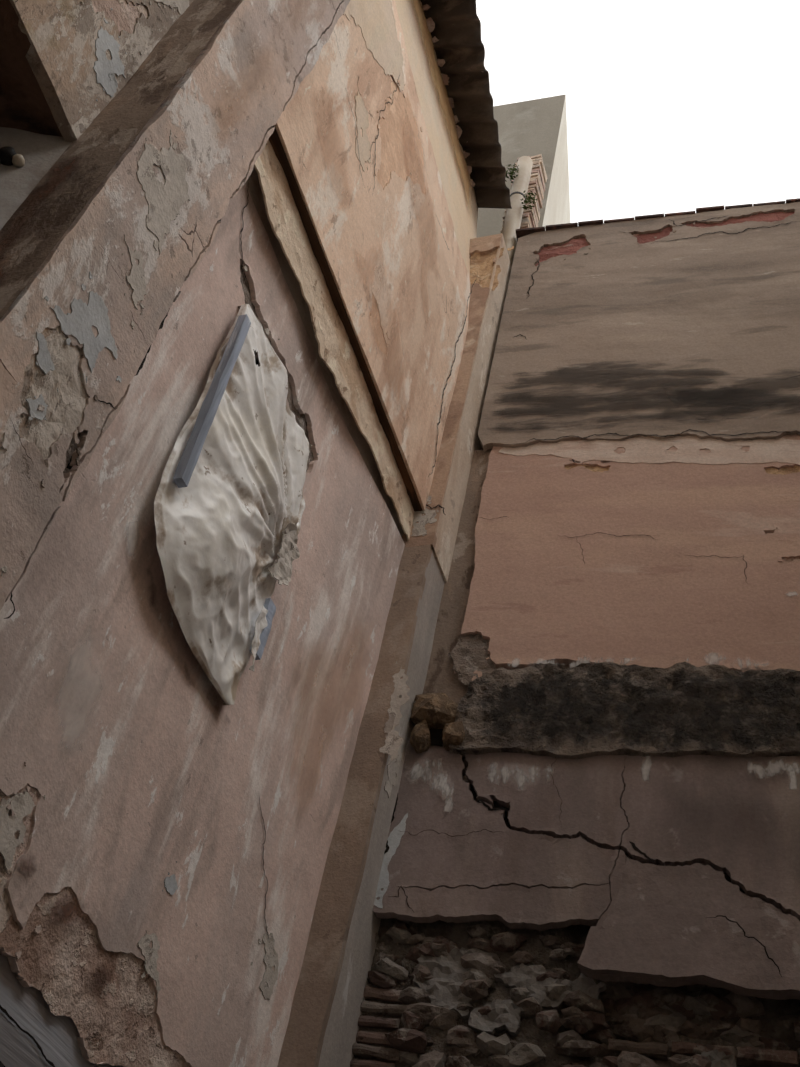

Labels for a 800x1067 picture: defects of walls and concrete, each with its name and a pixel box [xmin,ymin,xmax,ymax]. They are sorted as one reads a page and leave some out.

peeling [81,0,189,102]
flaking render [535,238,591,266]
flaking render [633,201,795,244]
flaking render [0,271,118,474]
crack [428,272,478,477]
leakage [494,363,800,431]
crack [518,429,800,444]
leakage [487,653,800,780]
crack [384,769,511,854]
leakage [748,761,798,789]
flaking render [0,785,190,1067]
crack [706,915,782,977]